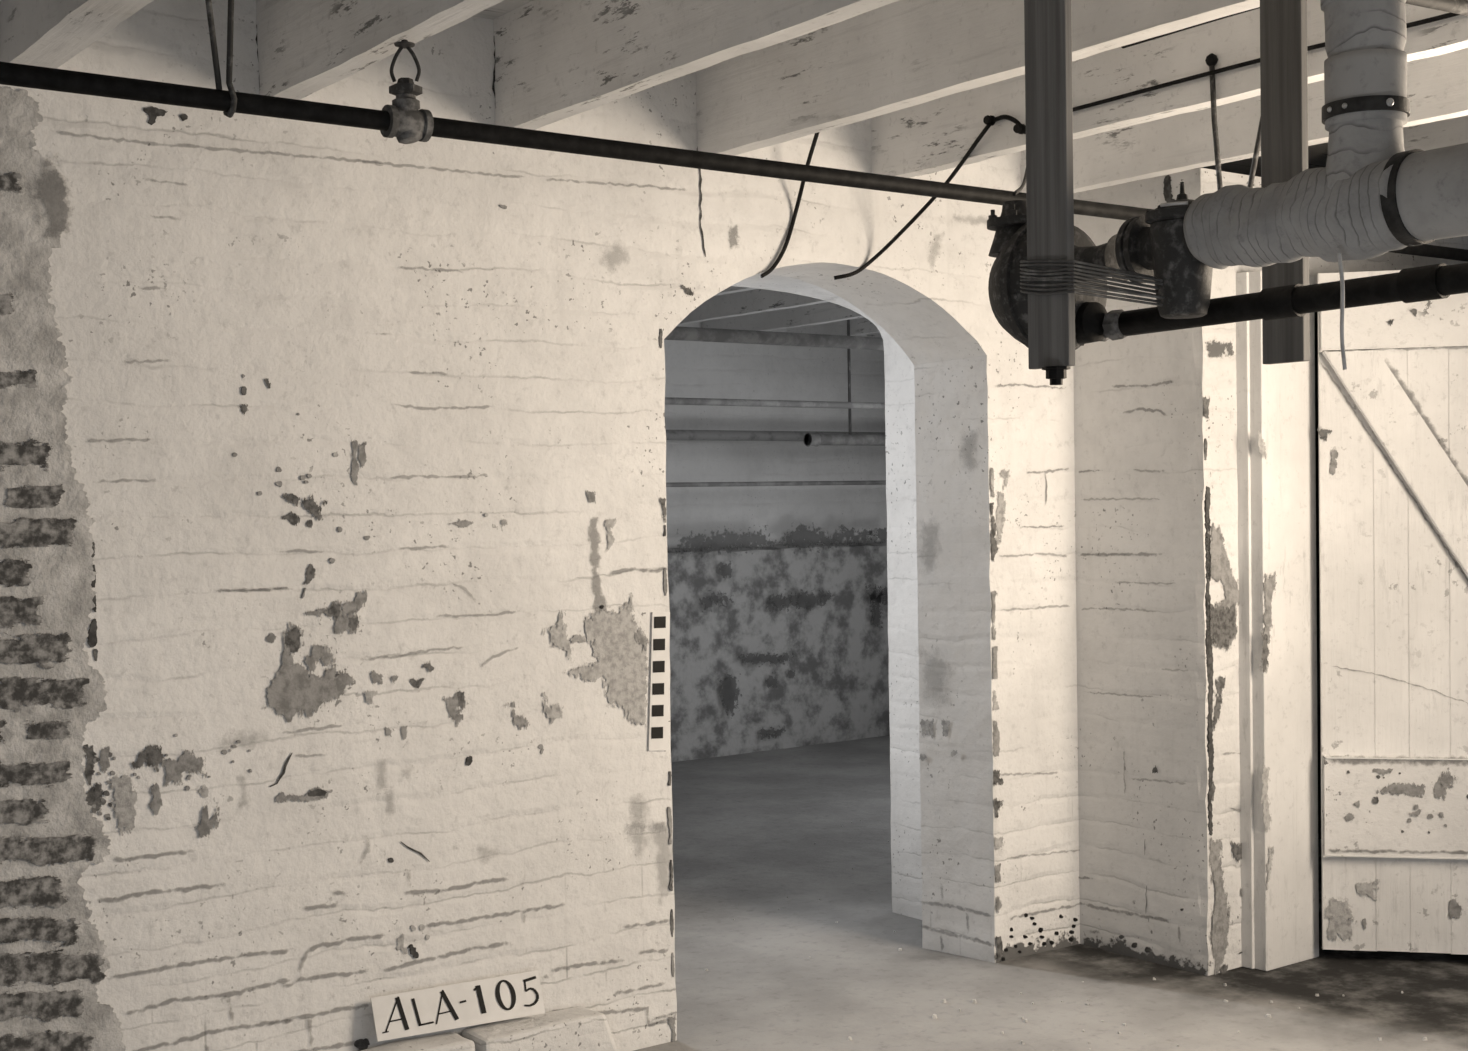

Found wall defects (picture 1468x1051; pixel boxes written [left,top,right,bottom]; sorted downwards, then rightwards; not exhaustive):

spalling [990,467,998,562]
flaking render [0,87,221,1051]
peeling [264,558,434,723]
peeling [542,593,650,729]
damp [719,652,795,717]
damp [760,726,786,740]
damp [672,522,887,613]
damp [865,584,888,628]
spalling [991,591,1004,818]
spalling [1204,486,1242,974]
peeling [1345,768,1468,833]
peeling [1325,879,1380,941]